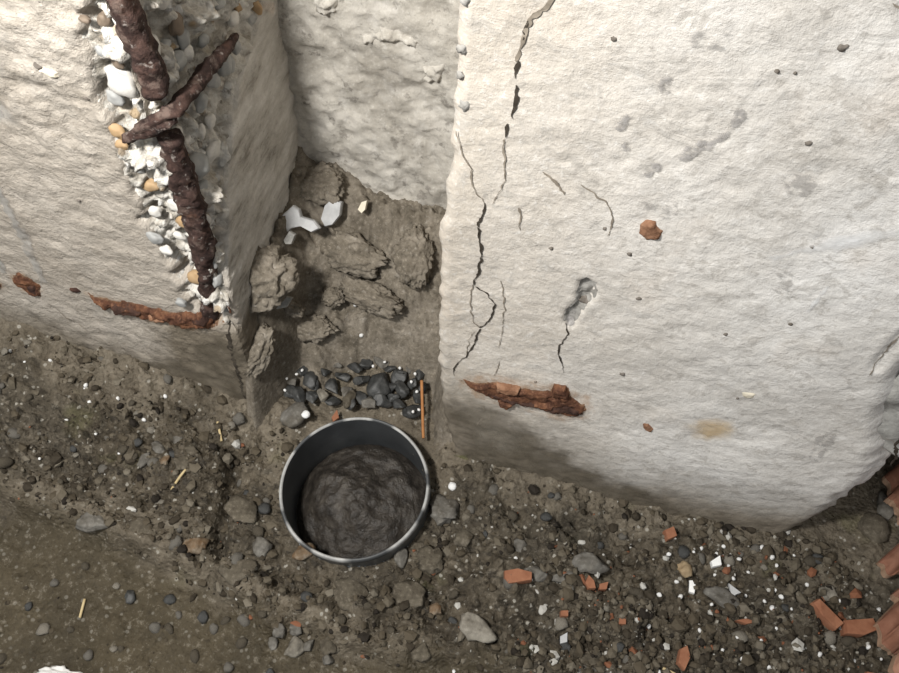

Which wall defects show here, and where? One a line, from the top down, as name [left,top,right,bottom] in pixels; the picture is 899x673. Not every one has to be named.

spalling [78,0,263,325]
flaking render [282,201,344,244]
crack [453,0,554,376]
crack [543,172,614,235]
corrosion [639,220,663,240]
corrosion [12,272,41,297]
corrosion [70,288,231,329]
crack [558,323,569,373]
corrosion [463,379,586,417]